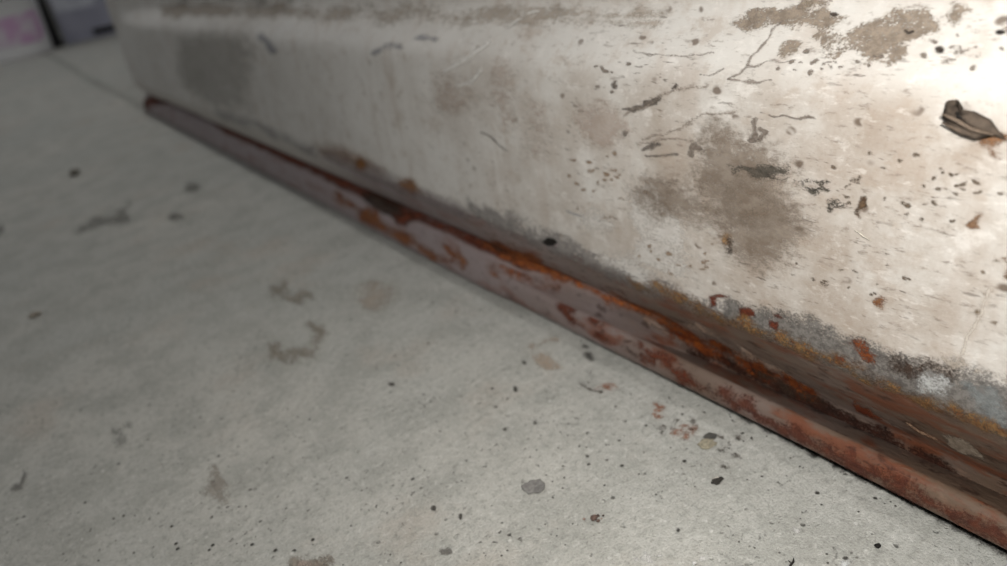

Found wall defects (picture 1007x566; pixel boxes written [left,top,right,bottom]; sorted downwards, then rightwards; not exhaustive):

peeling [777,49,843,75]
rust [143,97,1007,548]